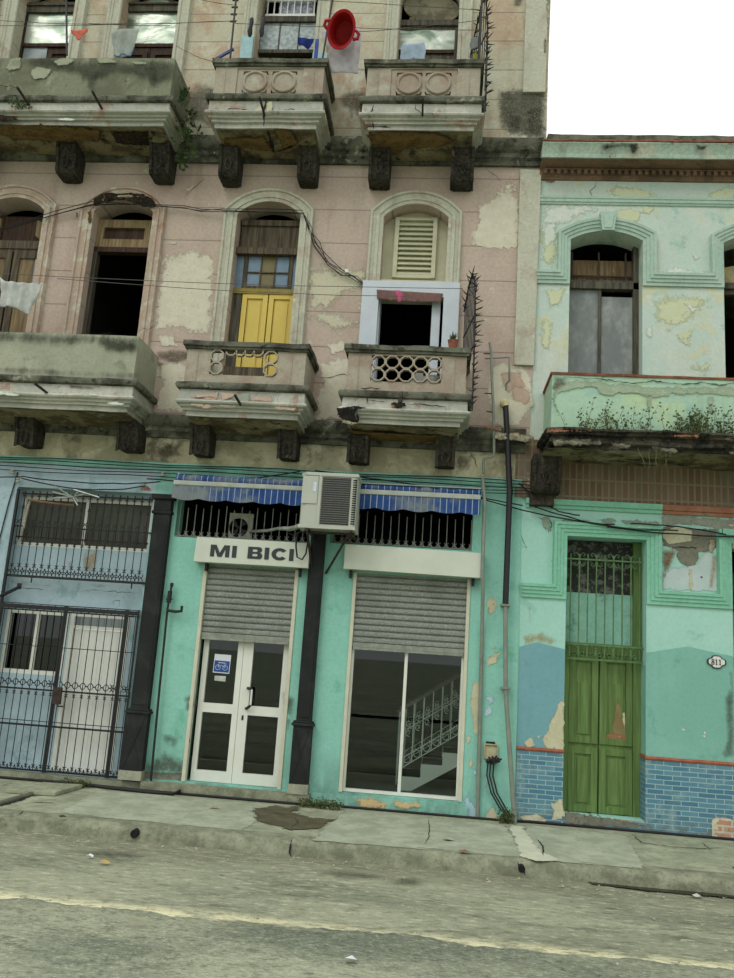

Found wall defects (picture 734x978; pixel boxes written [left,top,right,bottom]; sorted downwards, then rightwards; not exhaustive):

peeling [31,58,73,79]
damp [31,56,173,87]
damp [500,91,545,138]
peeling [470,184,519,251]
peeling [155,241,216,347]
damp [0,333,77,343]
damp [91,336,137,350]
peeling [156,361,296,412]
peeling [485,362,535,454]
peeling [602,515,734,592]
peeling [524,701,565,749]
peeling [357,798,421,809]